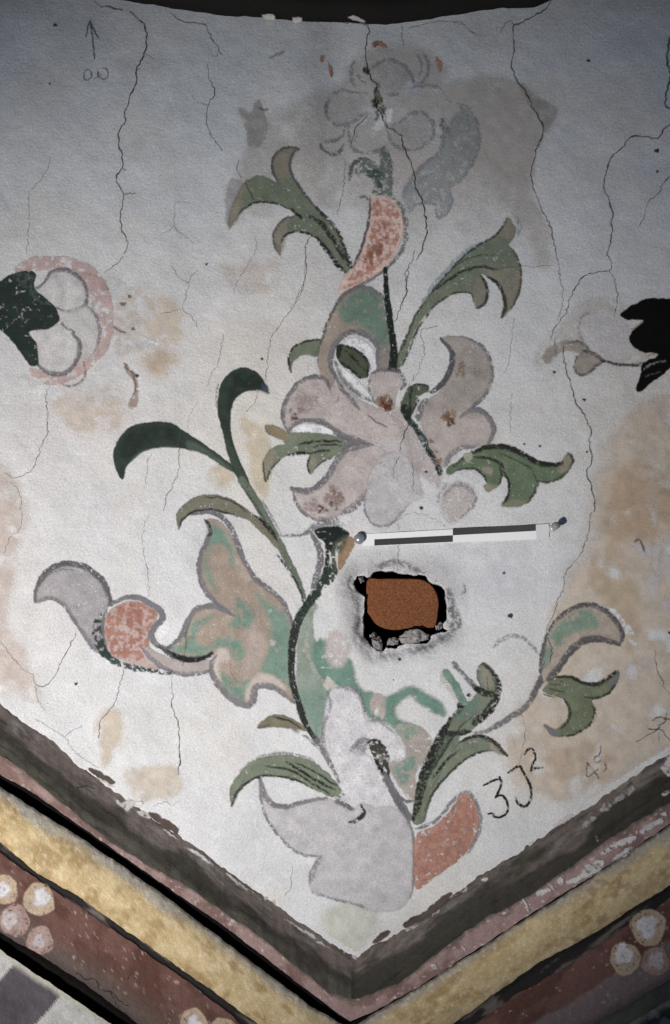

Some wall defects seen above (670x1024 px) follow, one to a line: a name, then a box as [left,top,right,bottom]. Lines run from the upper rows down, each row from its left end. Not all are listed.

crack [94,1,152,267]
crack [302,19,427,322]
crack [501,2,670,571]
leakage [508,398,670,799]